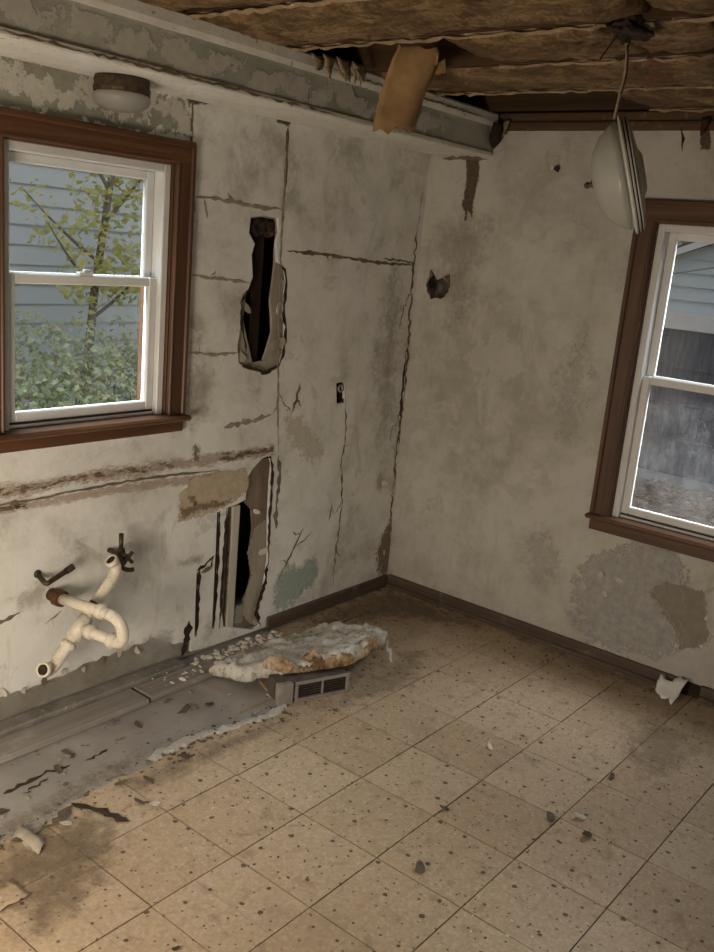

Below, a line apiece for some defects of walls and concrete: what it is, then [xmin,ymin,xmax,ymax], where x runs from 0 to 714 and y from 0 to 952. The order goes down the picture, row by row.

peeling [0,56,193,141]
crack [424,97,481,116]
crack [0,30,423,587]
spalling [237,216,287,375]
spalling [426,270,450,299]
spalling [178,456,274,657]
spalling [566,541,714,689]